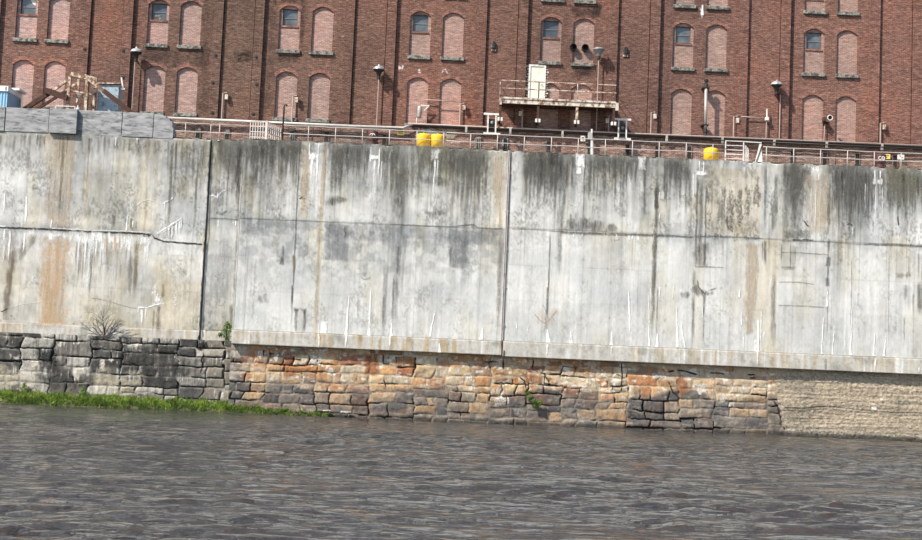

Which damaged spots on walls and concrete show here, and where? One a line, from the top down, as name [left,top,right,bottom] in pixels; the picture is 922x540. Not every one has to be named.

leakage [227,143,319,212]
leakage [812,167,922,225]
leakage [2,216,151,313]
leakage [138,286,164,326]